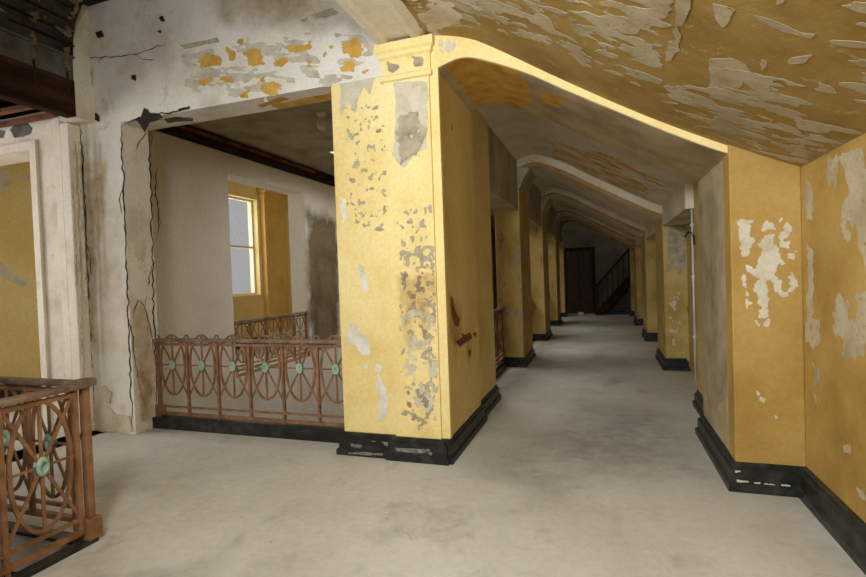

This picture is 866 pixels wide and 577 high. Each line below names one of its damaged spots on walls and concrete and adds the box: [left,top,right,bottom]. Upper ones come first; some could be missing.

spalling [133,106,193,132]
peeling [180,8,429,232]
peeling [358,264,369,293]
peeling [347,322,388,422]
peeling [397,204,439,431]
peeling [407,0,866,362]
peeling [698,178,728,412]